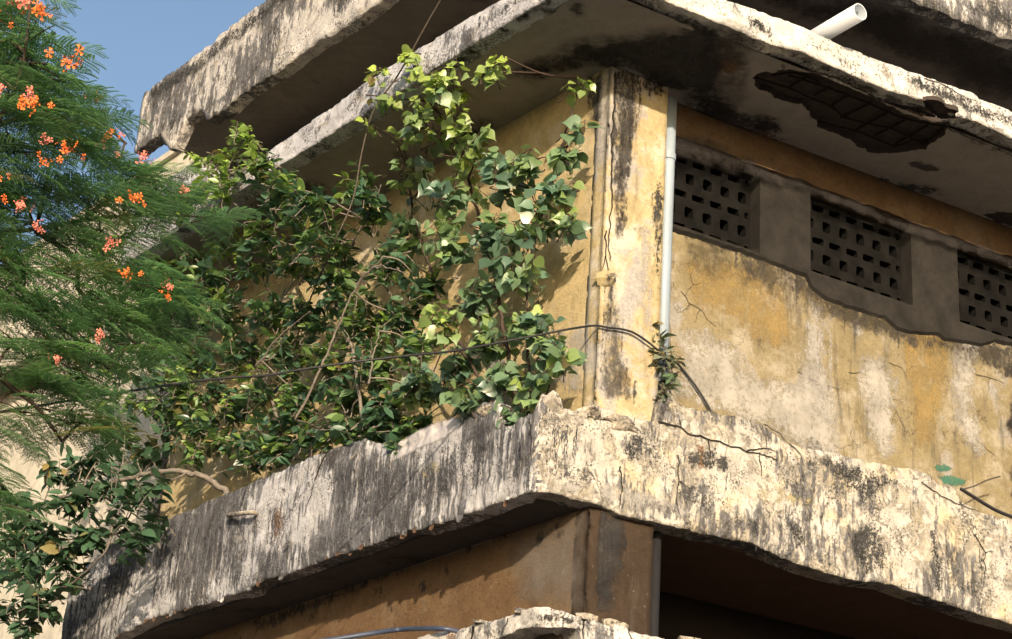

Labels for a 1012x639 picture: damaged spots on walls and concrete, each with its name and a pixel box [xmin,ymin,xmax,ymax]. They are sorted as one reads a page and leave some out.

damp [150,0,300,107]
crack [602,72,616,270]
damp [522,0,781,326]
spalling [753,64,959,171]
spalling [984,212,1012,226]
crack [680,265,715,326]
damp [687,248,1012,446]
damp [683,447,733,490]
crack [634,417,804,519]
damp [807,434,897,508]
damp [847,520,888,579]
flaking render [576,612,635,633]